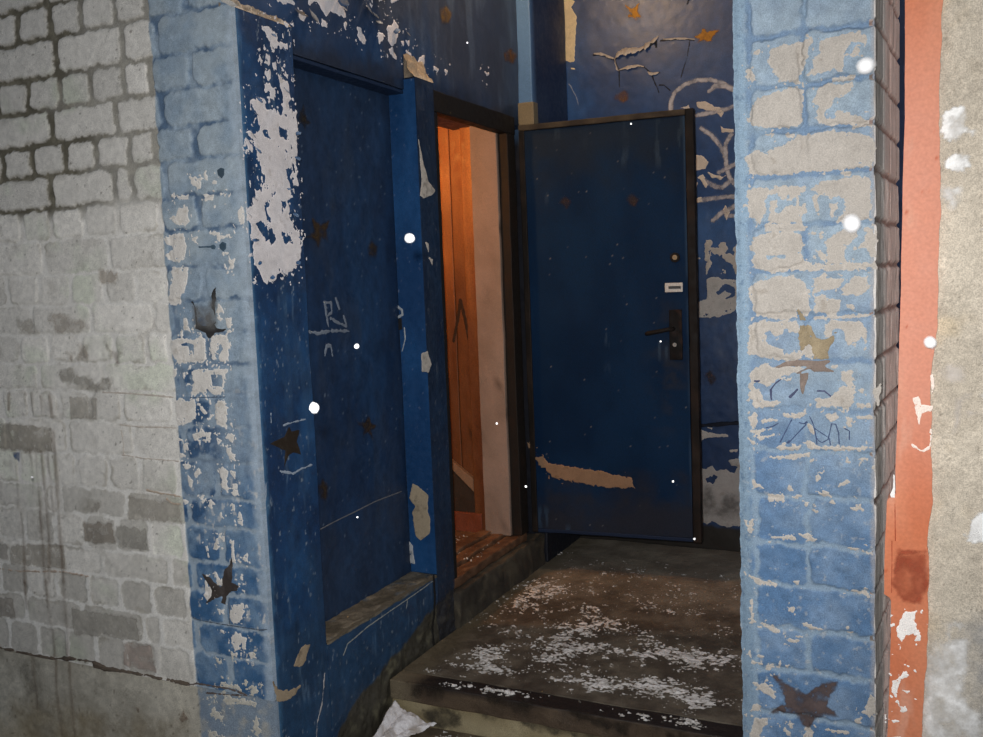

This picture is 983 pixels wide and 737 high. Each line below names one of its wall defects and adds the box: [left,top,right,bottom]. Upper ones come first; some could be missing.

peeling [564,0,577,70]
crack [593,36,695,93]
peeling [682,101,734,133]
peeling [696,30,882,537]
peeling [83,0,448,667]
peeling [913,396,933,424]
peeling [768,531,817,543]
peeling [890,609,928,655]
crack [0,647,247,696]
spalling [203,676,301,737]